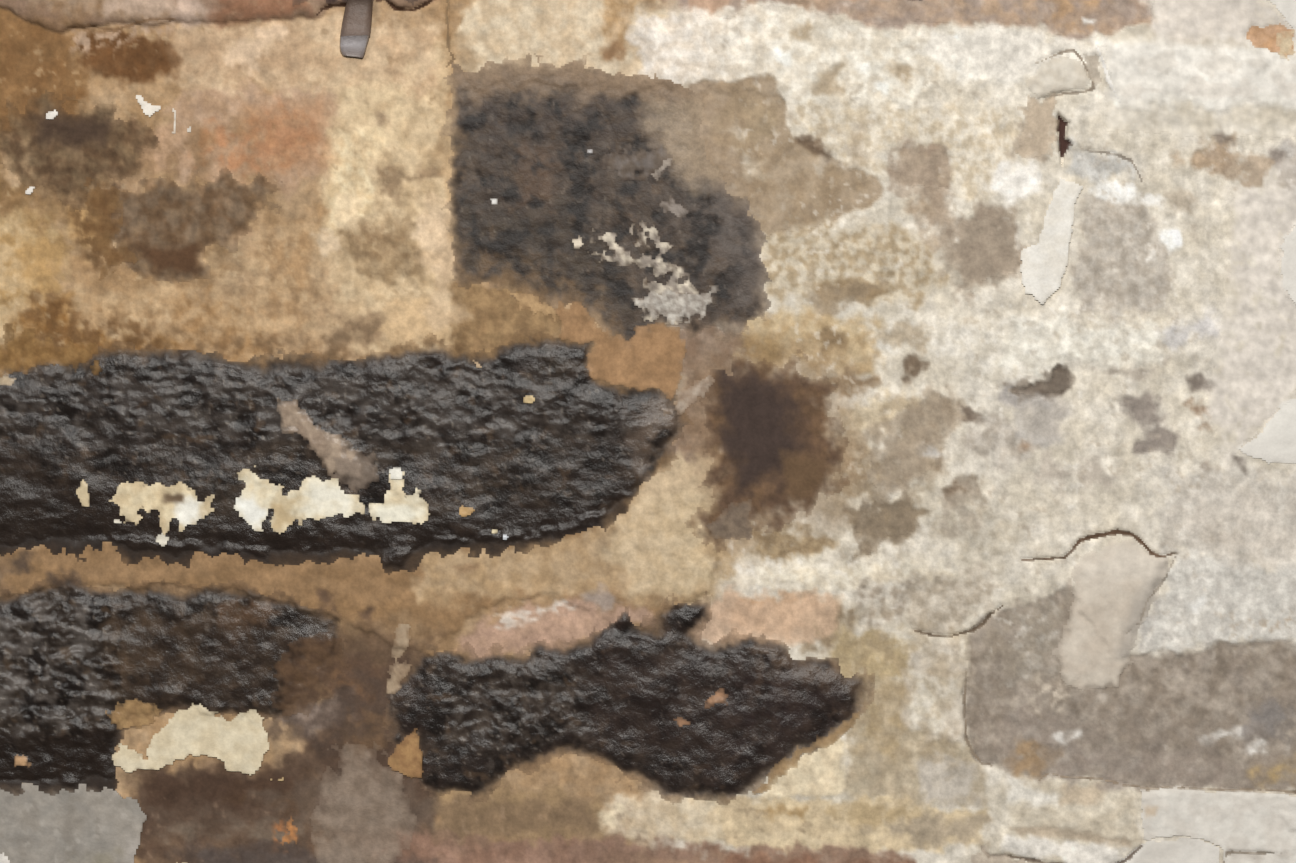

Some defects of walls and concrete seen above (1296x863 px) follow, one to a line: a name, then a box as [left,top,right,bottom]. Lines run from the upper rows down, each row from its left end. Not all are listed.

leakage [587,143,675,181]
leakage [572,196,721,325]
peeling [76,479,90,507]
peeling [109,481,215,547]
peeling [234,465,430,534]
crack [1021,528,1179,634]
flaking render [964,584,1296,792]
crack [1039,773,1296,794]
crack [971,845,1061,863]
crack [1117,845,1143,863]
crack [1223,850,1282,863]